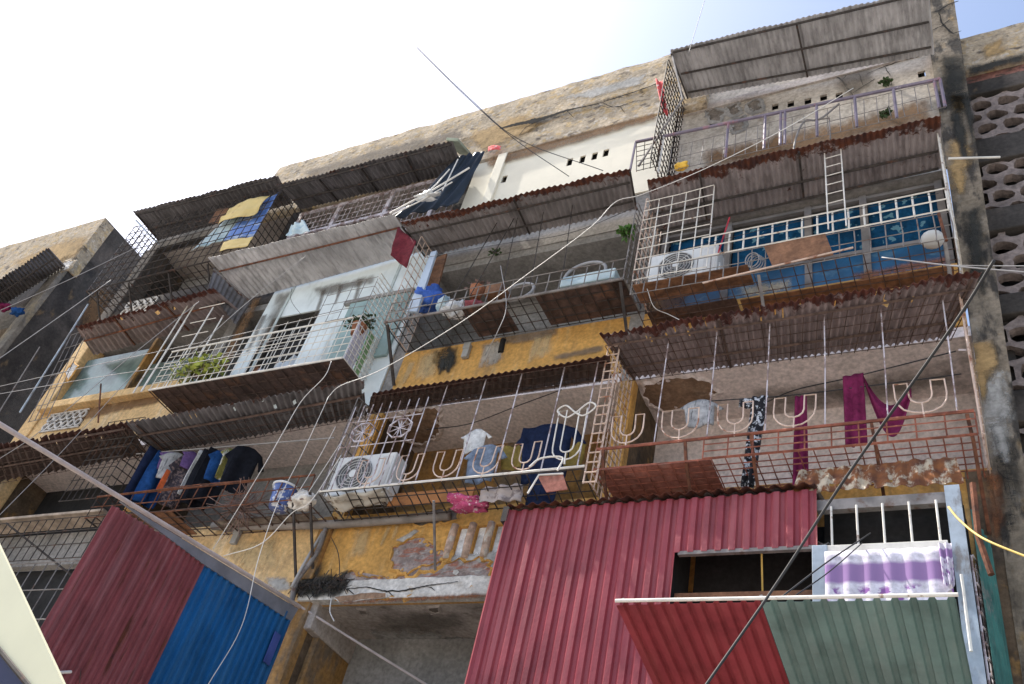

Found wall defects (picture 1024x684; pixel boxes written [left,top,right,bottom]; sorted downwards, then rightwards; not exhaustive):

crack [500,79,673,134]
flaking render [639,371,724,415]
flaking render [333,506,493,603]